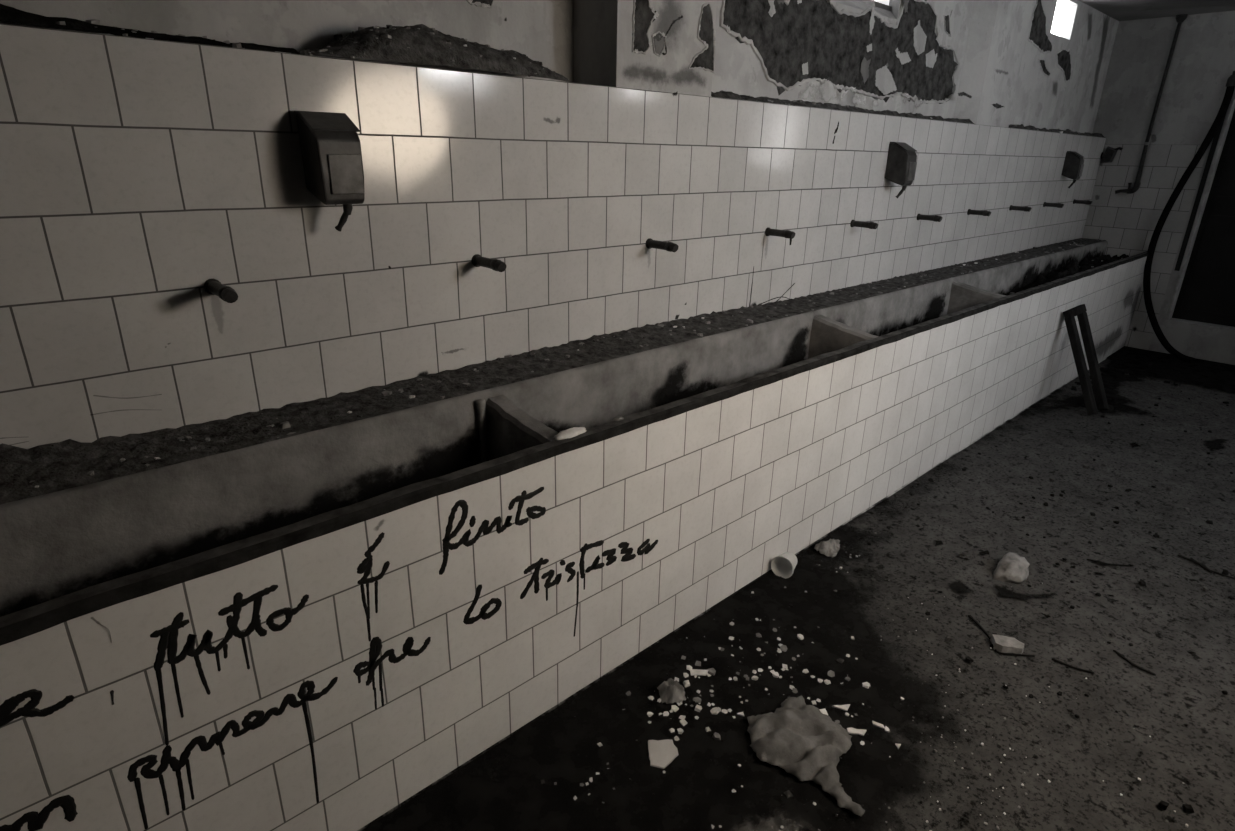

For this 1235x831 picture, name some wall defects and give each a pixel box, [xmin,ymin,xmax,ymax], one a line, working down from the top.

peeling [467,0,495,8]
peeling [632,0,667,57]
flaking render [688,0,960,104]
flaking render [1028,0,1072,83]